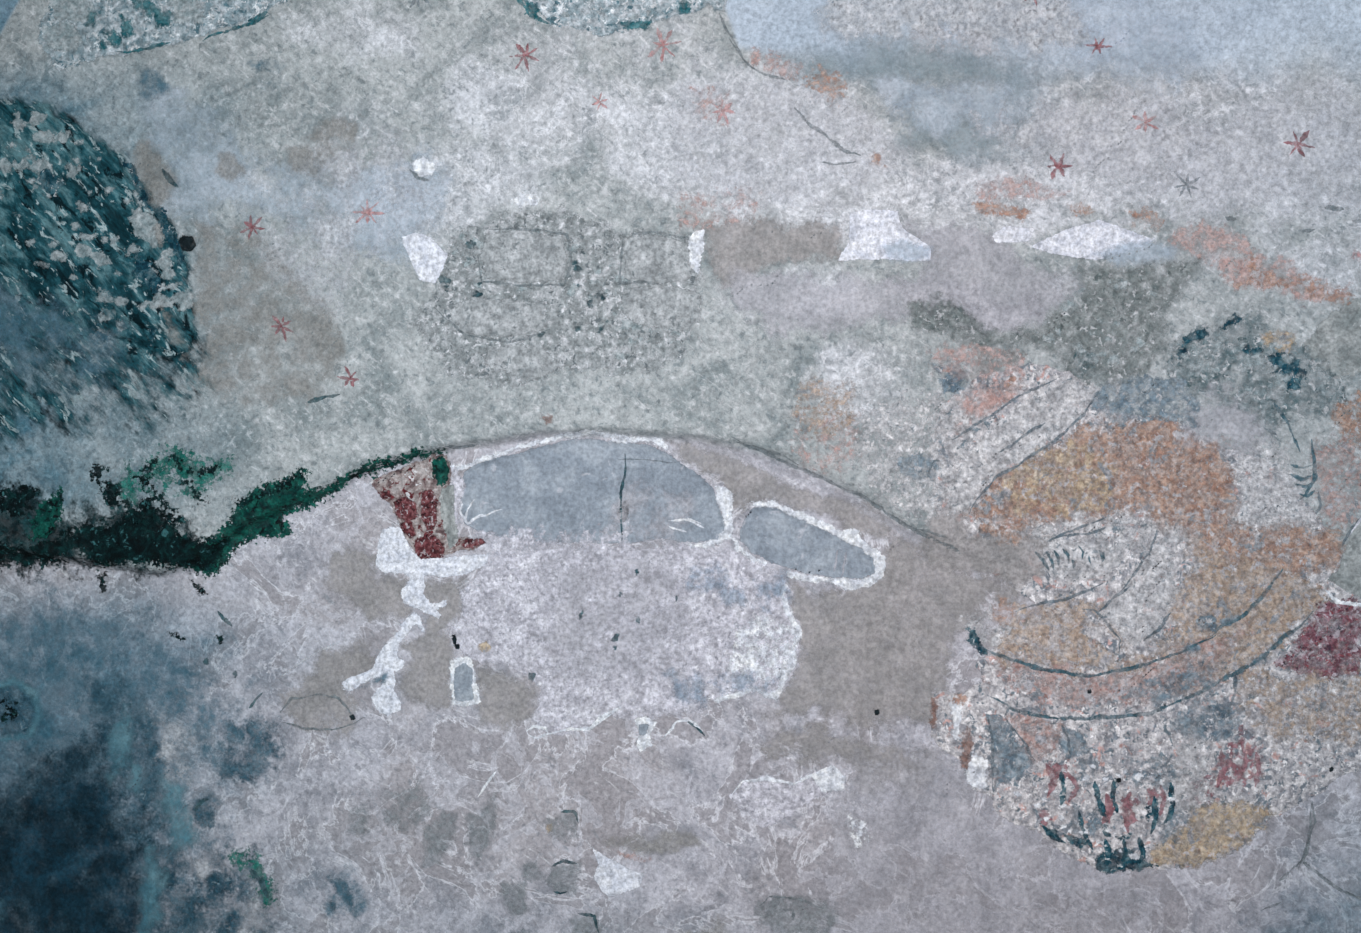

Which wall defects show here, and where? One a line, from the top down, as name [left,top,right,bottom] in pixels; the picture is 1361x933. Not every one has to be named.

flaking render [37,0,288,71]
flaking render [524,0,727,37]
peeling [838,209,931,262]
peeling [992,219,1171,294]
peeling [966,296,1042,330]
crack [444,442,475,450]
crack [619,456,663,539]
crack [732,437,960,554]